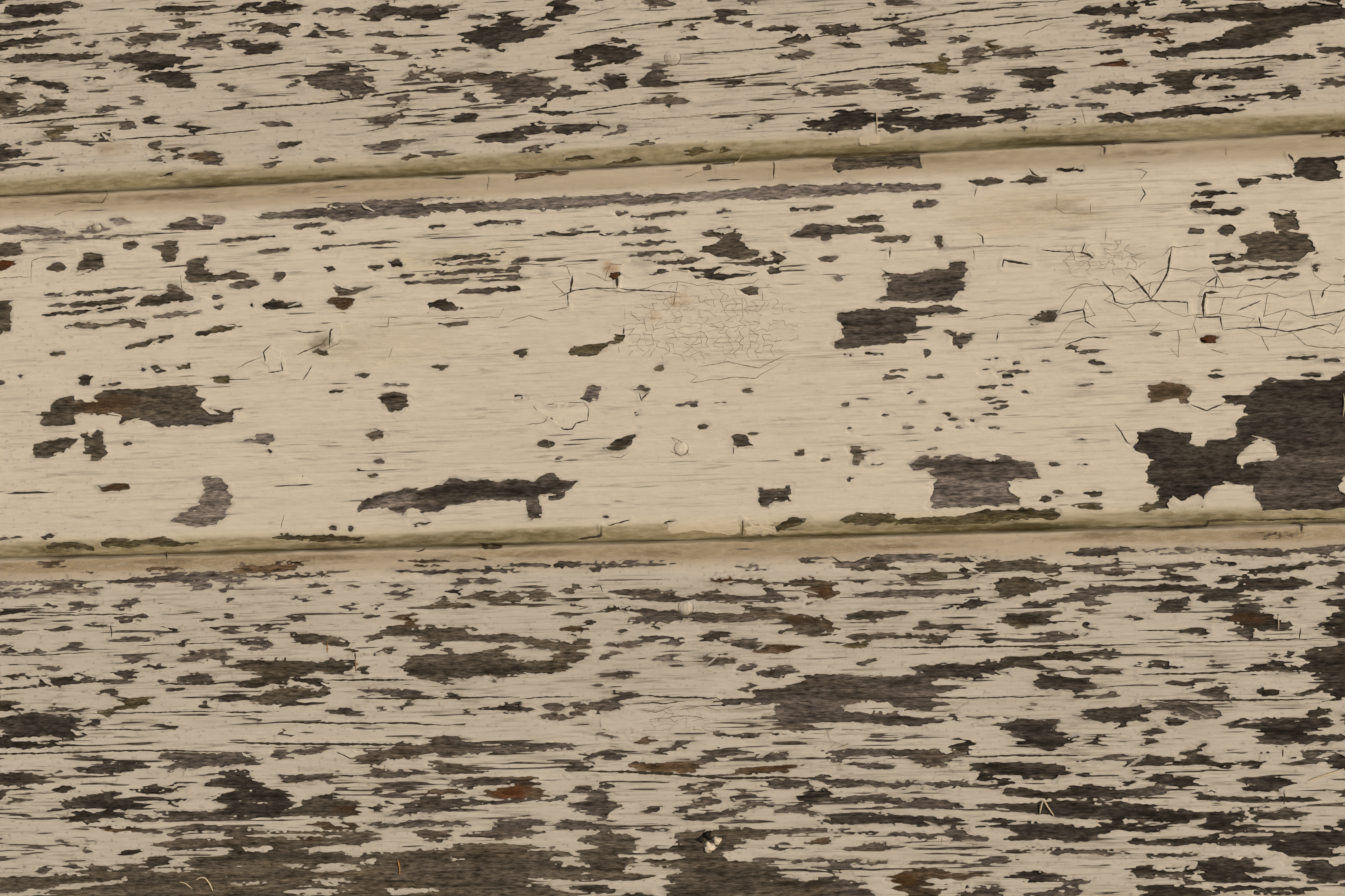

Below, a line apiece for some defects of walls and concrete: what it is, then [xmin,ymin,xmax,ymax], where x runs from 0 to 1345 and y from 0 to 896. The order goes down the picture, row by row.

peeling [0,0,1345,358]
peeling [32,363,248,461]
peeling [239,433,275,453]
peeling [329,373,370,394]
peeling [272,383,636,544]
peeling [731,432,759,448]
peeling [840,345,1112,526]
peeling [1133,355,1345,514]
peeling [0,476,1345,896]